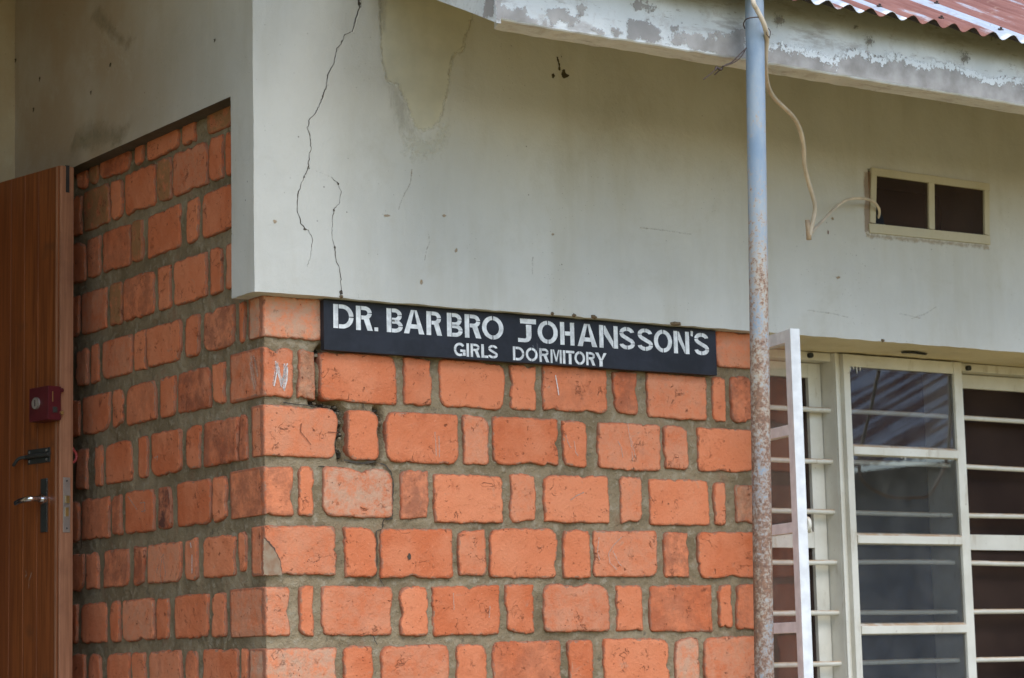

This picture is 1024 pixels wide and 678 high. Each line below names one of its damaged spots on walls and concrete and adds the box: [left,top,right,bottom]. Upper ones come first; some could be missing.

peeling [483,0,746,58]
peeling [768,41,1024,104]
crack [297,0,361,295]